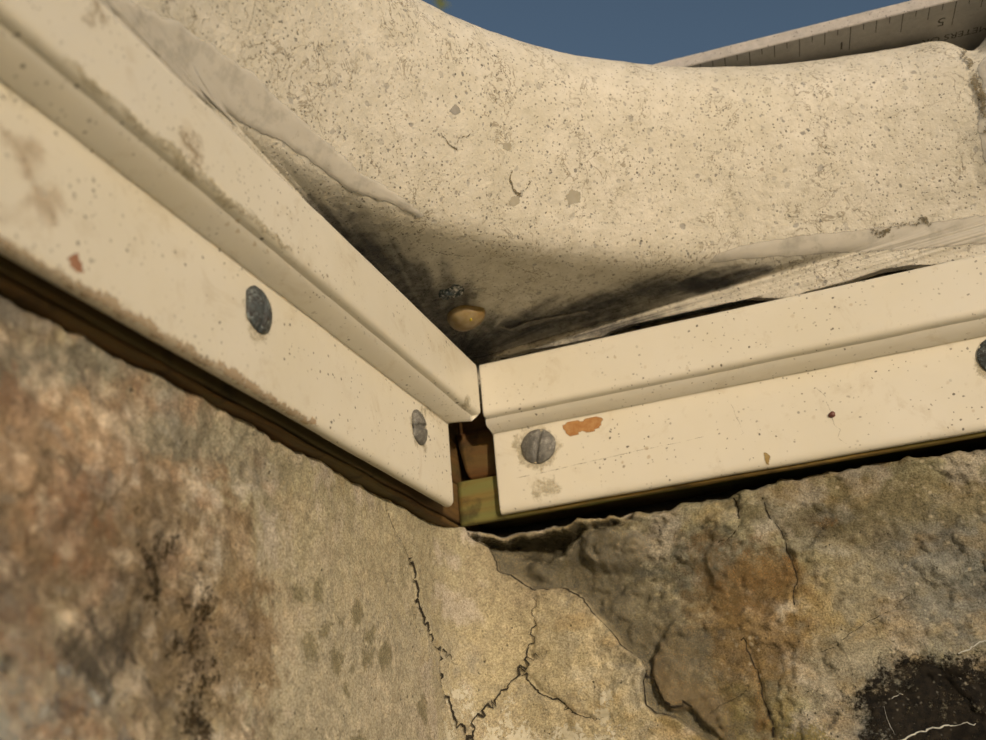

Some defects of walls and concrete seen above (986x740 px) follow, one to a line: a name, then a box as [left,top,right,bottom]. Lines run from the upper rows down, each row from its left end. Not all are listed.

damp [305,199,771,372]
crack [388,514,611,740]
spalling [440,519,735,740]
crack [711,637,775,738]
crack [761,497,798,605]
damp [842,648,986,740]